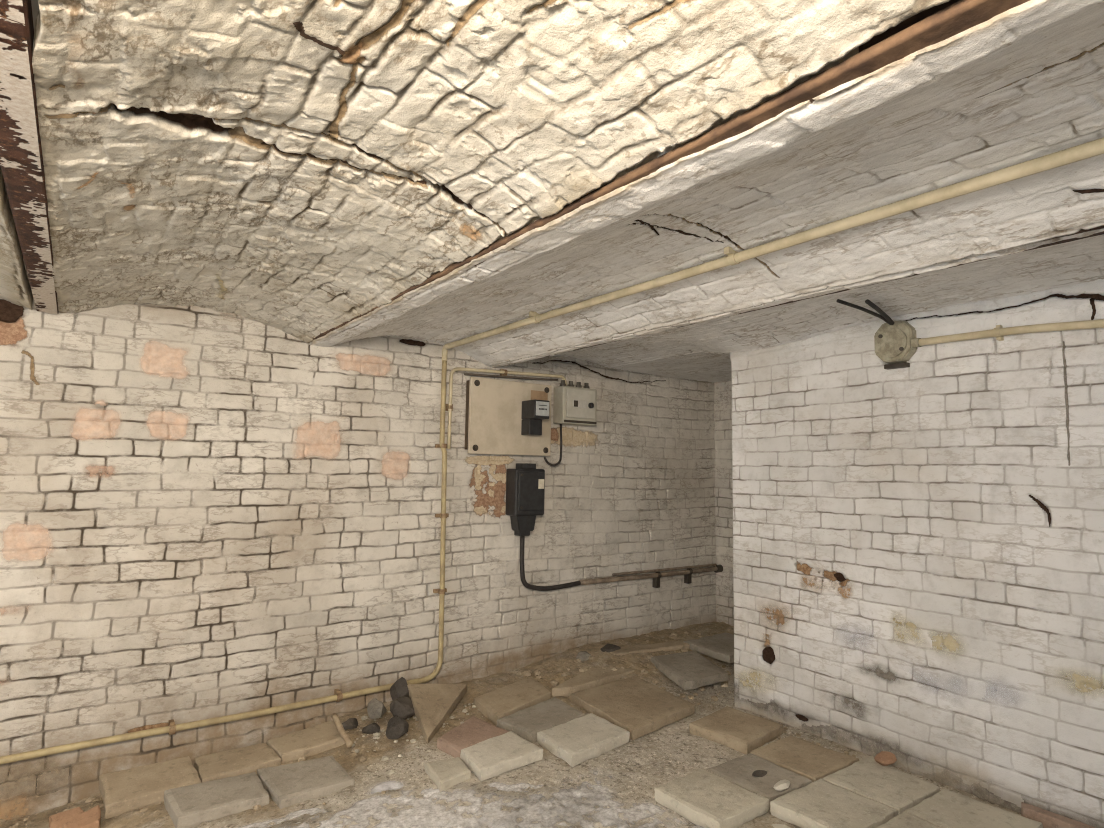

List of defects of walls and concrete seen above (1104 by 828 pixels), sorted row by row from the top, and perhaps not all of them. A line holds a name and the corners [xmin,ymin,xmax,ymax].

crack [526,0,556,14]
crack [628,0,692,29]
crack [44,0,506,234]
peeling [0,0,58,385]
crack [1073,187,1104,195]
crack [629,214,780,278]
peeling [72,401,119,439]
peeling [147,411,187,439]
peeling [297,421,340,459]
spalling [465,456,514,518]
crack [1029,495,1051,527]
spalling [795,561,851,598]